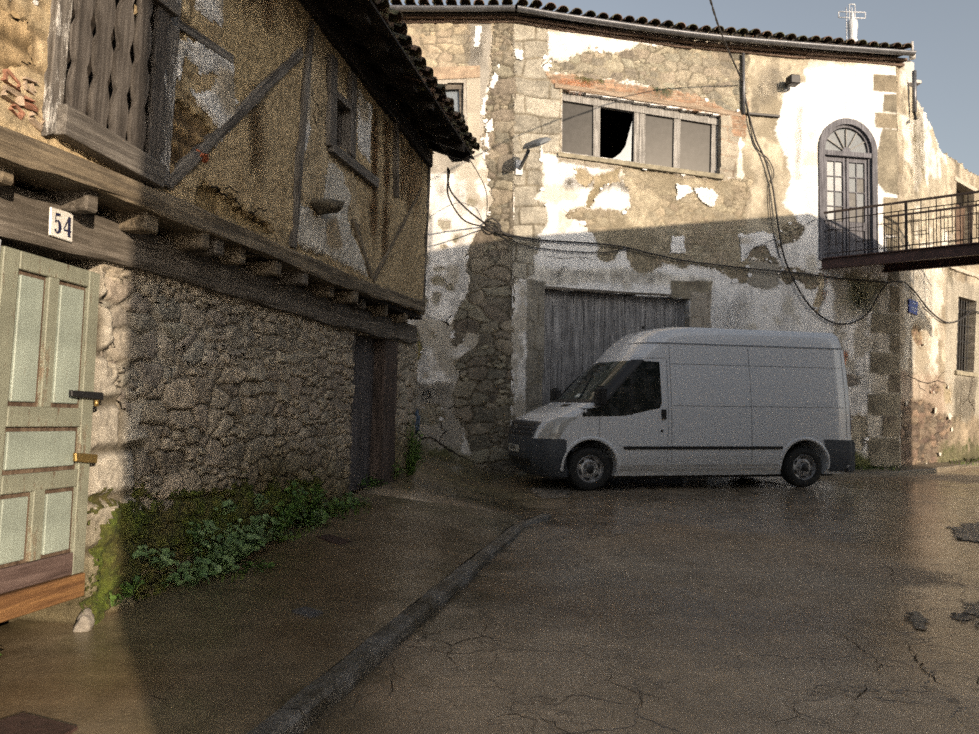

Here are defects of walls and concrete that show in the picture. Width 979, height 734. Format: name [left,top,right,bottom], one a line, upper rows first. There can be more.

spalling [0,0,46,132]
peeling [169,38,239,173]
peeling [425,267,454,304]
peeling [429,214,459,249]
peeling [450,19,750,473]
peeling [564,166,825,312]
spalling [900,383,953,466]
spalling [946,522,979,542]
spalling [948,600,979,627]
crack [772,631,883,733]
crack [909,645,979,701]